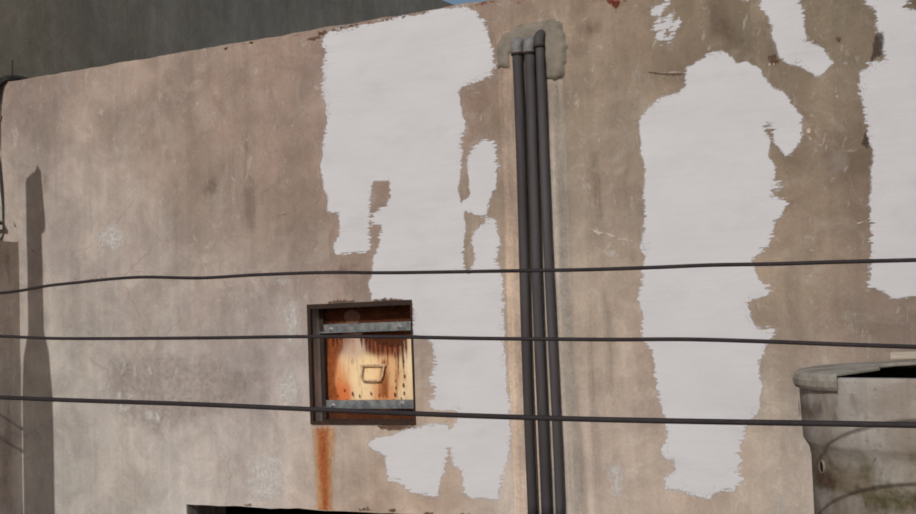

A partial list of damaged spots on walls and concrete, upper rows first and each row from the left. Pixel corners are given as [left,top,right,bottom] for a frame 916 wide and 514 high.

corrosion [315,305,414,510]